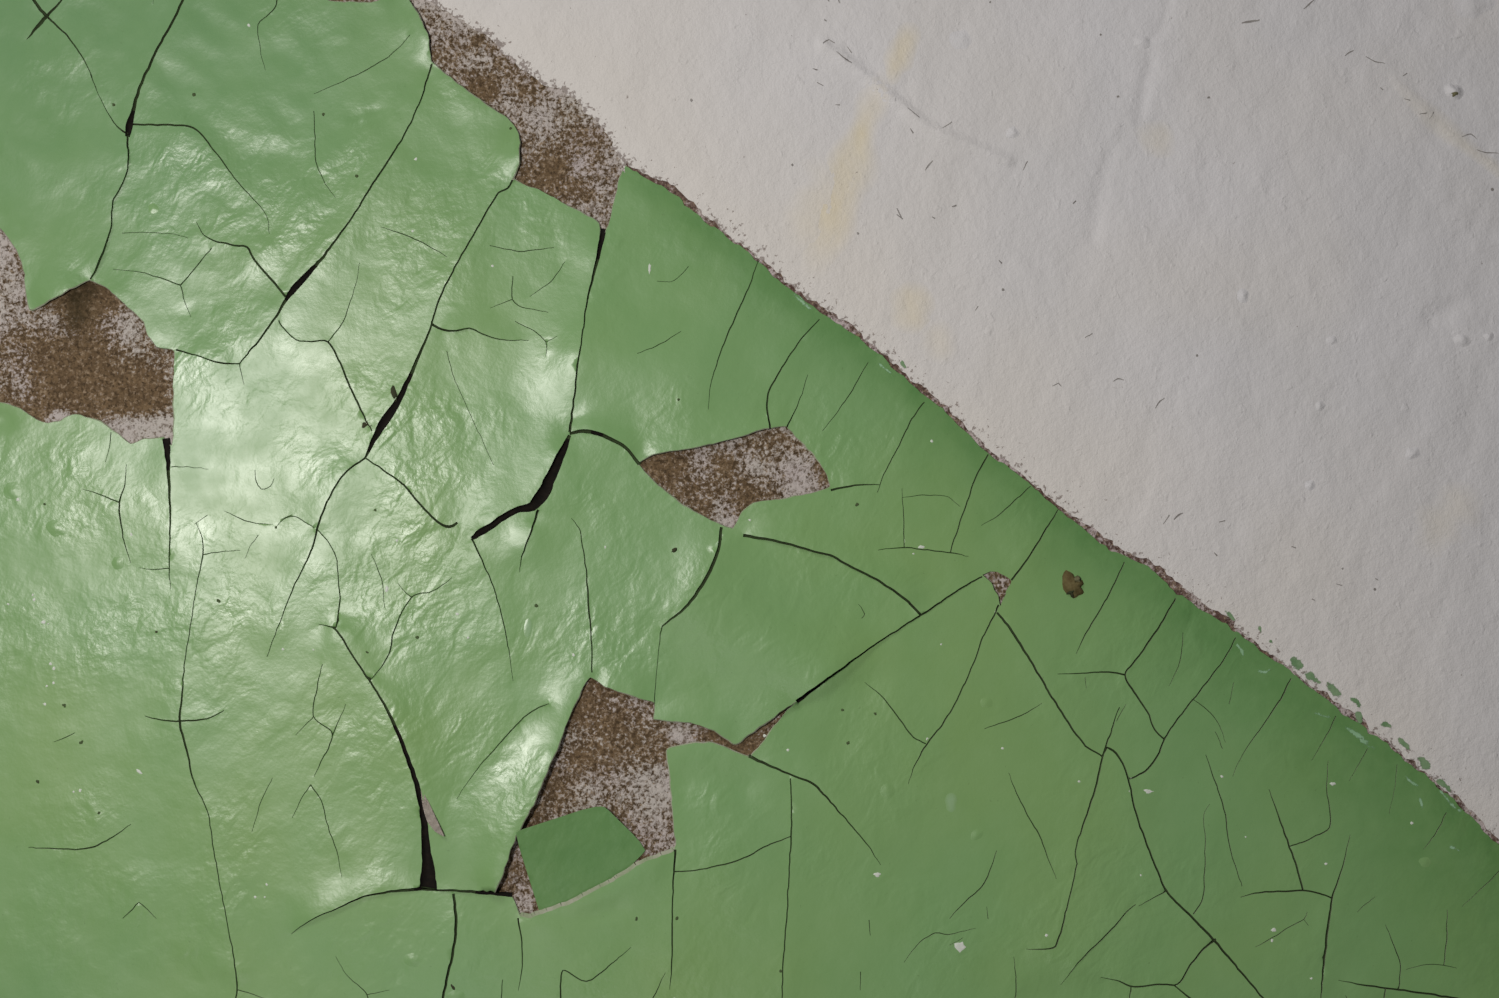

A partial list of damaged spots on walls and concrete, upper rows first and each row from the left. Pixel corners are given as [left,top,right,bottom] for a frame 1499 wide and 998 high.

peeling [0,0,235,445]
crack [27,0,641,998]
peeling [133,0,919,916]
crack [708,261,759,407]
crack [766,319,868,431]
crack [813,0,878,105]
peeling [626,162,1499,844]